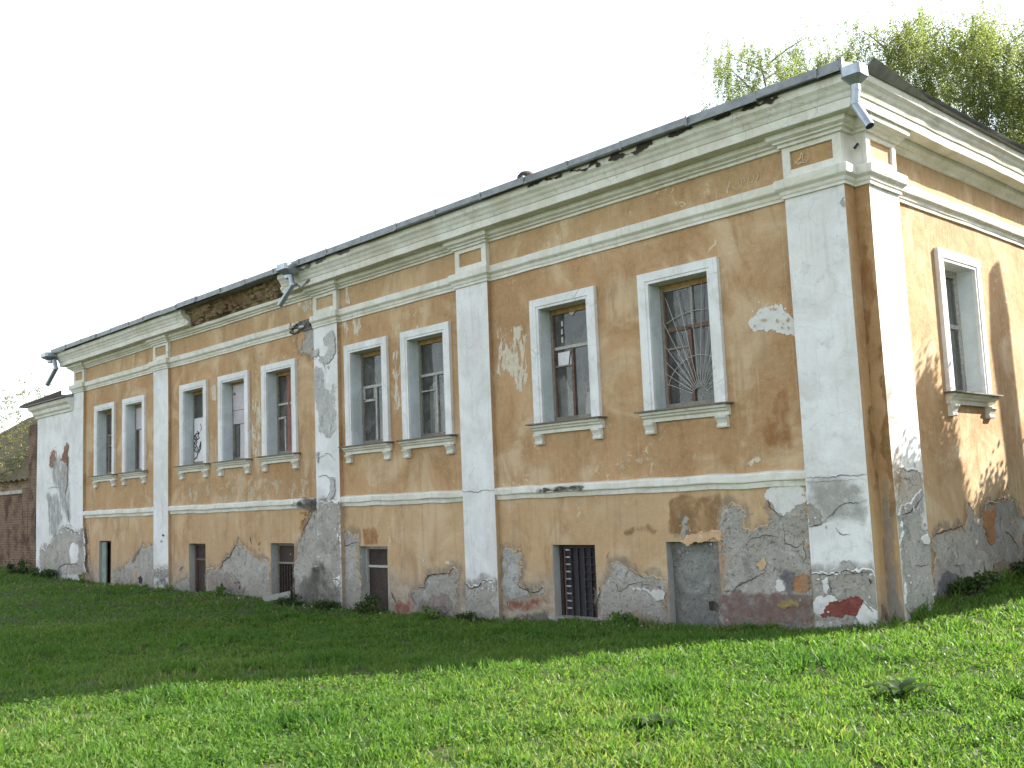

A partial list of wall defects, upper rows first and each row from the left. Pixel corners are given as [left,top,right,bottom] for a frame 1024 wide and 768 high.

peeling [595,141,653,167]
peeling [741,301,795,337]
peeling [297,318,361,438]
peeling [497,325,528,392]
spalling [49,442,68,493]
spalling [39,518,93,582]
spalling [114,534,190,592]
spalling [186,398,362,609]
spalling [412,541,545,620]
spalling [596,552,668,625]
spalling [678,486,879,630]
spalling [894,458,1024,613]